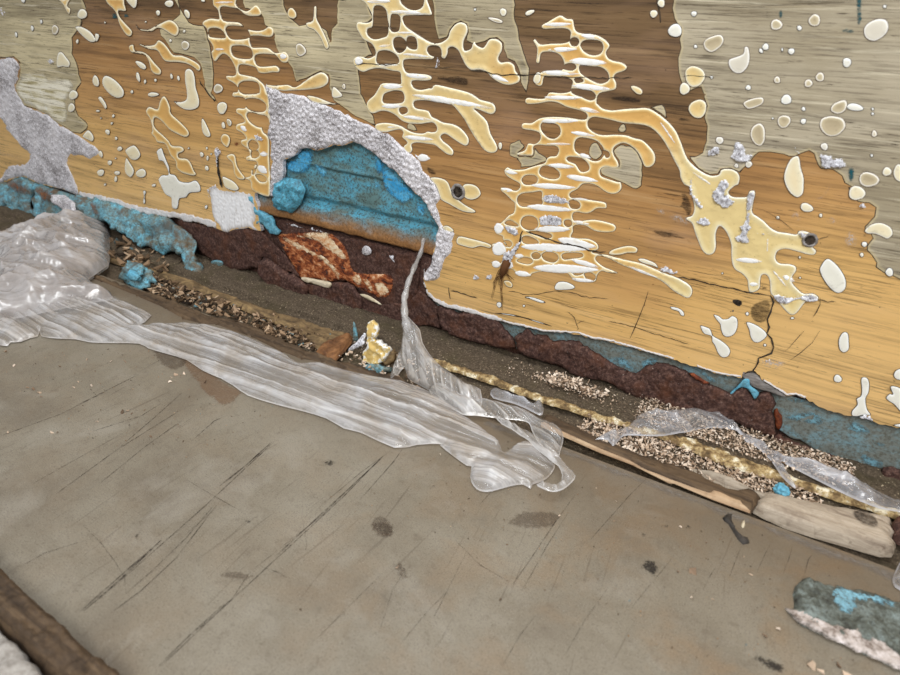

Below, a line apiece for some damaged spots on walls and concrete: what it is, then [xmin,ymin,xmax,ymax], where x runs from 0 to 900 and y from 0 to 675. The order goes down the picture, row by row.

peeling [160,0,216,102]
peeling [432,0,530,93]
peeling [0,0,204,272]
spalling [210,0,454,281]
peeling [510,140,547,167]
peeling [589,142,643,189]
peeling [672,0,900,279]
spalling [348,320,397,374]
rust [178,219,811,450]
peeling [499,321,900,469]
crack [678,277,835,374]